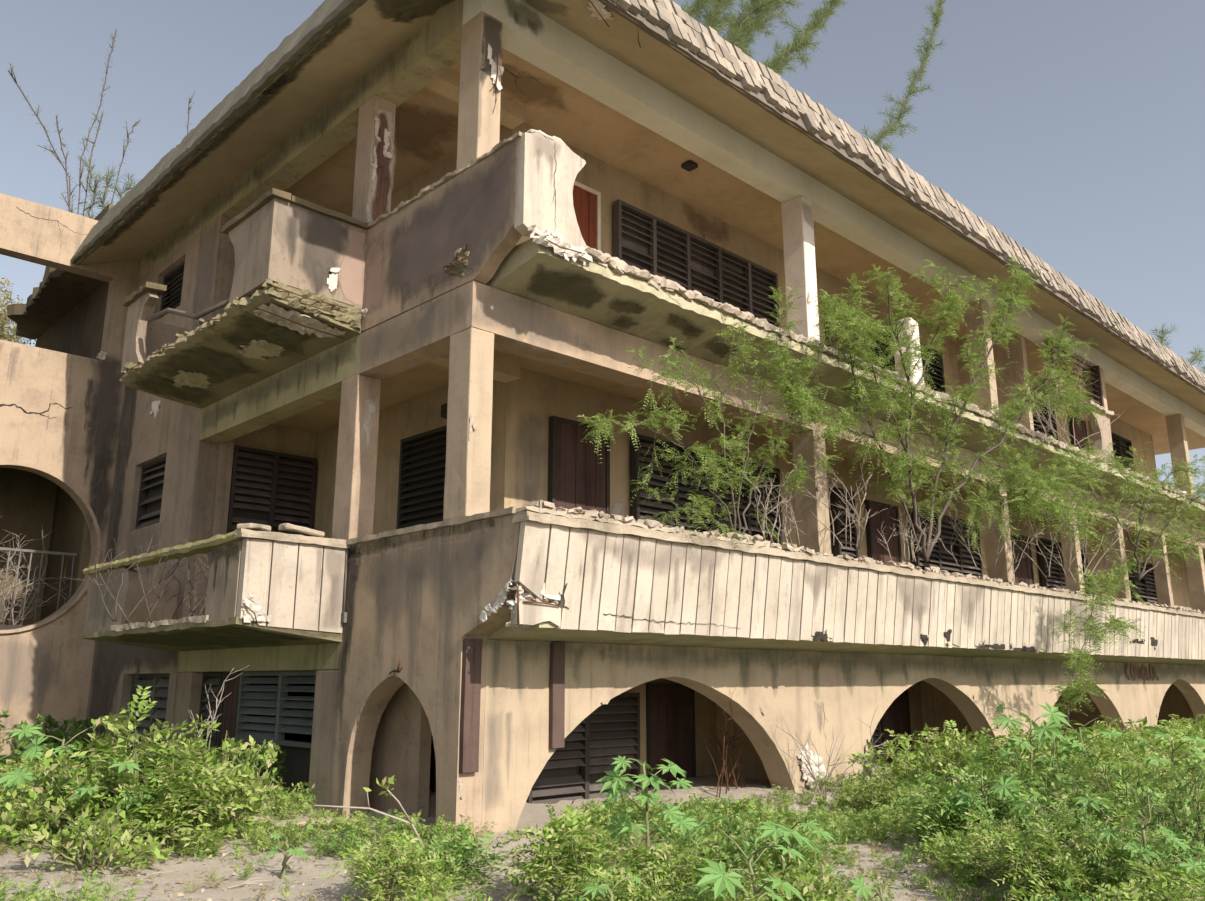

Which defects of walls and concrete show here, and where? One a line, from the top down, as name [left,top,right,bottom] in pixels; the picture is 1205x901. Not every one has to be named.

spalling [487,43,504,93]
crack [17,207,88,240]
peeling [253,109,514,339]
damp [528,267,644,329]
peeling [237,339,286,361]
damp [662,314,737,358]
spalling [528,225,1095,460]
crack [0,403,72,419]
damp [85,317,350,563]
spalling [242,592,272,623]
spalling [479,576,561,628]